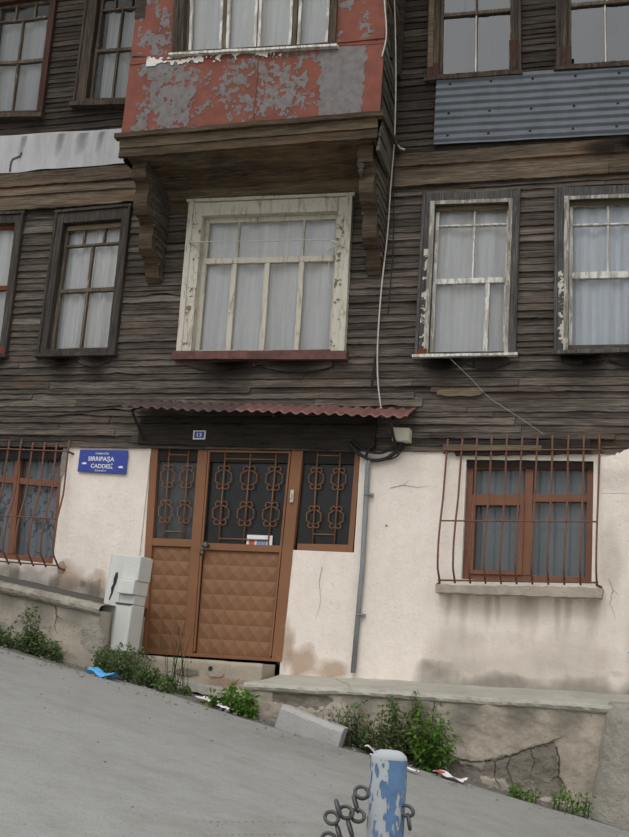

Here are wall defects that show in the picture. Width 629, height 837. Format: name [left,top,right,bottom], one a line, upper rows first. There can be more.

peeling [130,0,375,131]
crack [432,702,567,795]